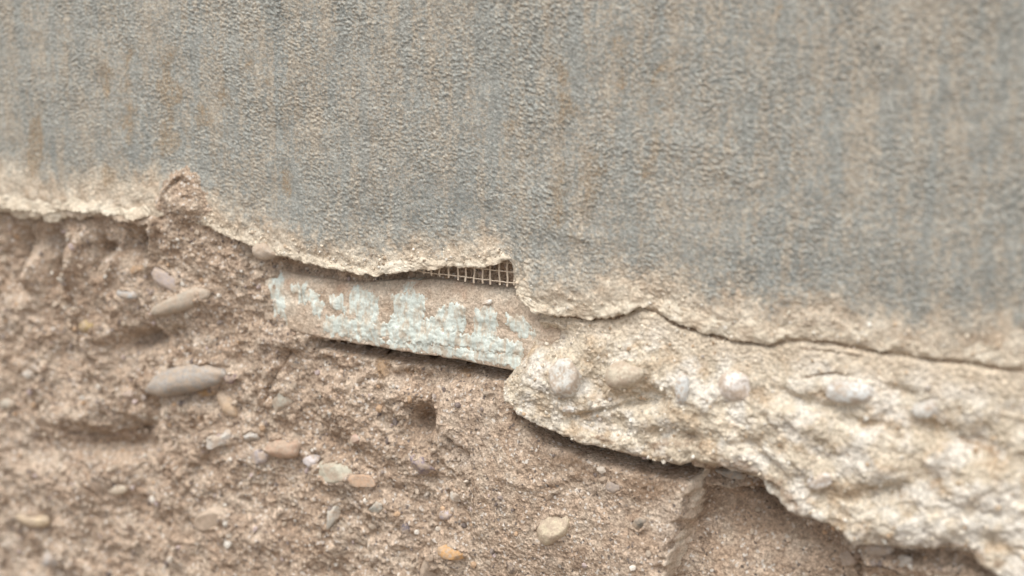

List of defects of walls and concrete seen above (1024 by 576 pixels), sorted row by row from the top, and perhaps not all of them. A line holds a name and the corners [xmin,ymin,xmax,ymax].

peeling [0,194,156,227]
peeling [203,221,1024,370]
crack [559,308,1022,380]
spalling [86,441,127,468]
spalling [661,461,760,576]